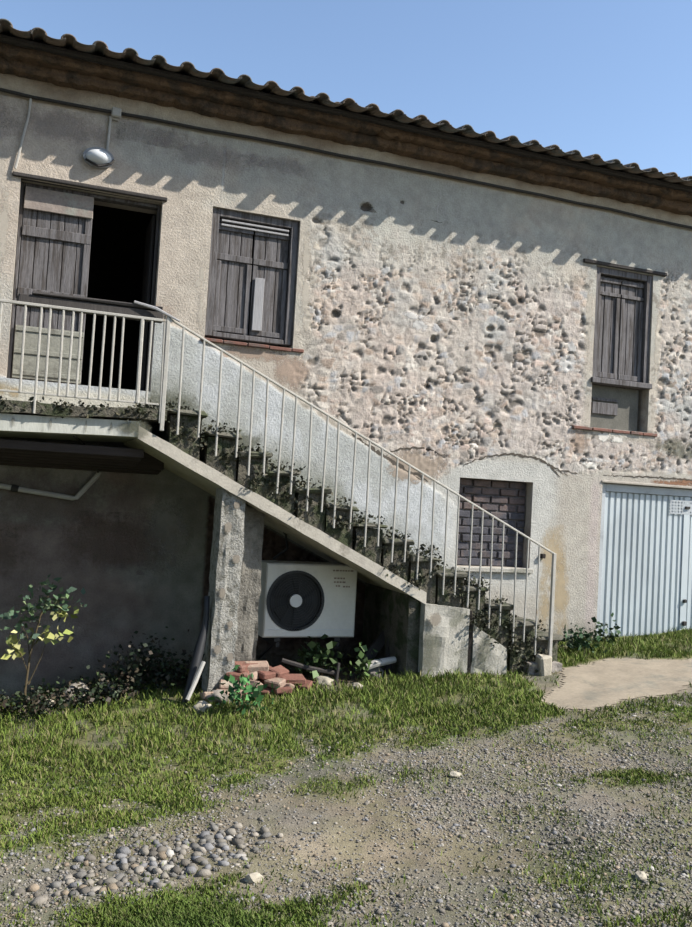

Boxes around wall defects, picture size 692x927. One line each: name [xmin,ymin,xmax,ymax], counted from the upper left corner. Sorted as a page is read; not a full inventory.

peeling [402,312,437,341]
flaking render [558,290,593,373]
flaking render [654,307,674,388]
crack [352,433,445,482]
crack [466,453,577,477]
flaking render [571,431,610,469]
peeling [598,432,623,443]
crack [604,473,692,481]